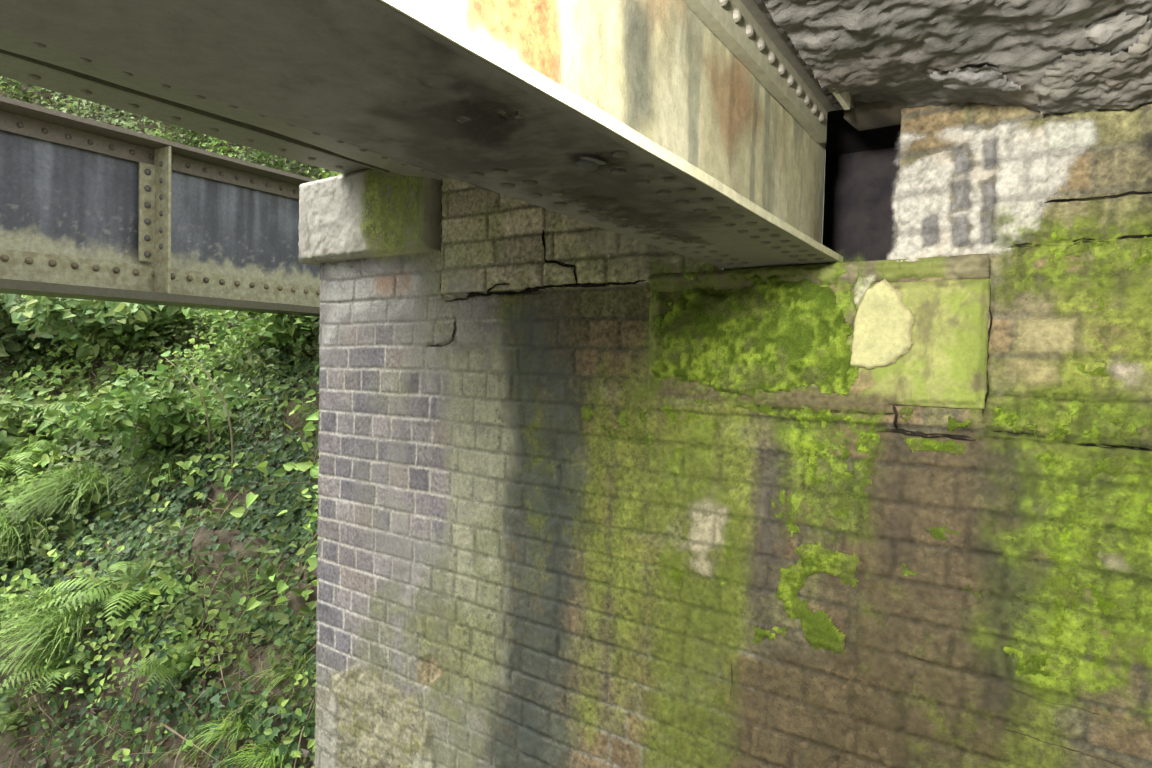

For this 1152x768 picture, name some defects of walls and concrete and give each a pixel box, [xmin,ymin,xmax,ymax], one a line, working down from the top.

rust [466,0,560,84]
peeling [888,12,1152,262]
crack [430,182,647,347]
water stain [649,378,888,411]
spalling [849,276,914,395]
crack [757,234,1152,451]
water stain [1015,315,1080,384]
water stain [1112,365,1136,377]
water stain [685,503,727,576]
water stain [730,435,1023,768]
spalling [315,668,433,768]